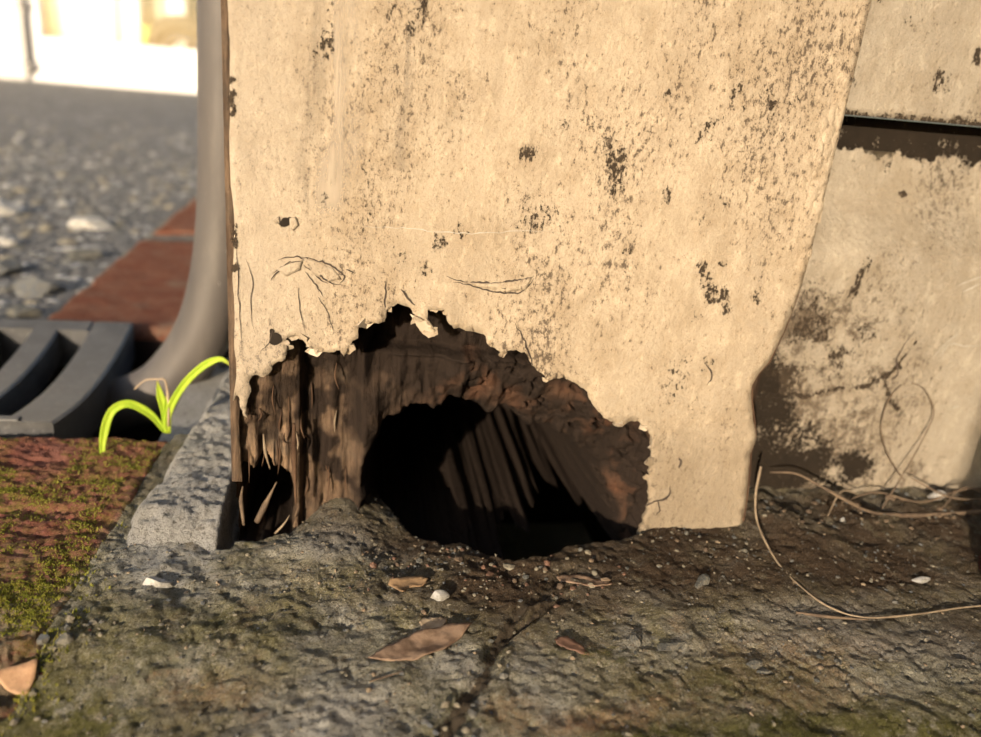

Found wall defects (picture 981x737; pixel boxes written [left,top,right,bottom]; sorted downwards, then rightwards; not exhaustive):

water stain [695,260,733,316]
peeling [270,329,322,357]
peeling [410,309,447,338]
water stain [749,255,917,489]
peeling [642,445,657,481]
crack [430,567,580,737]